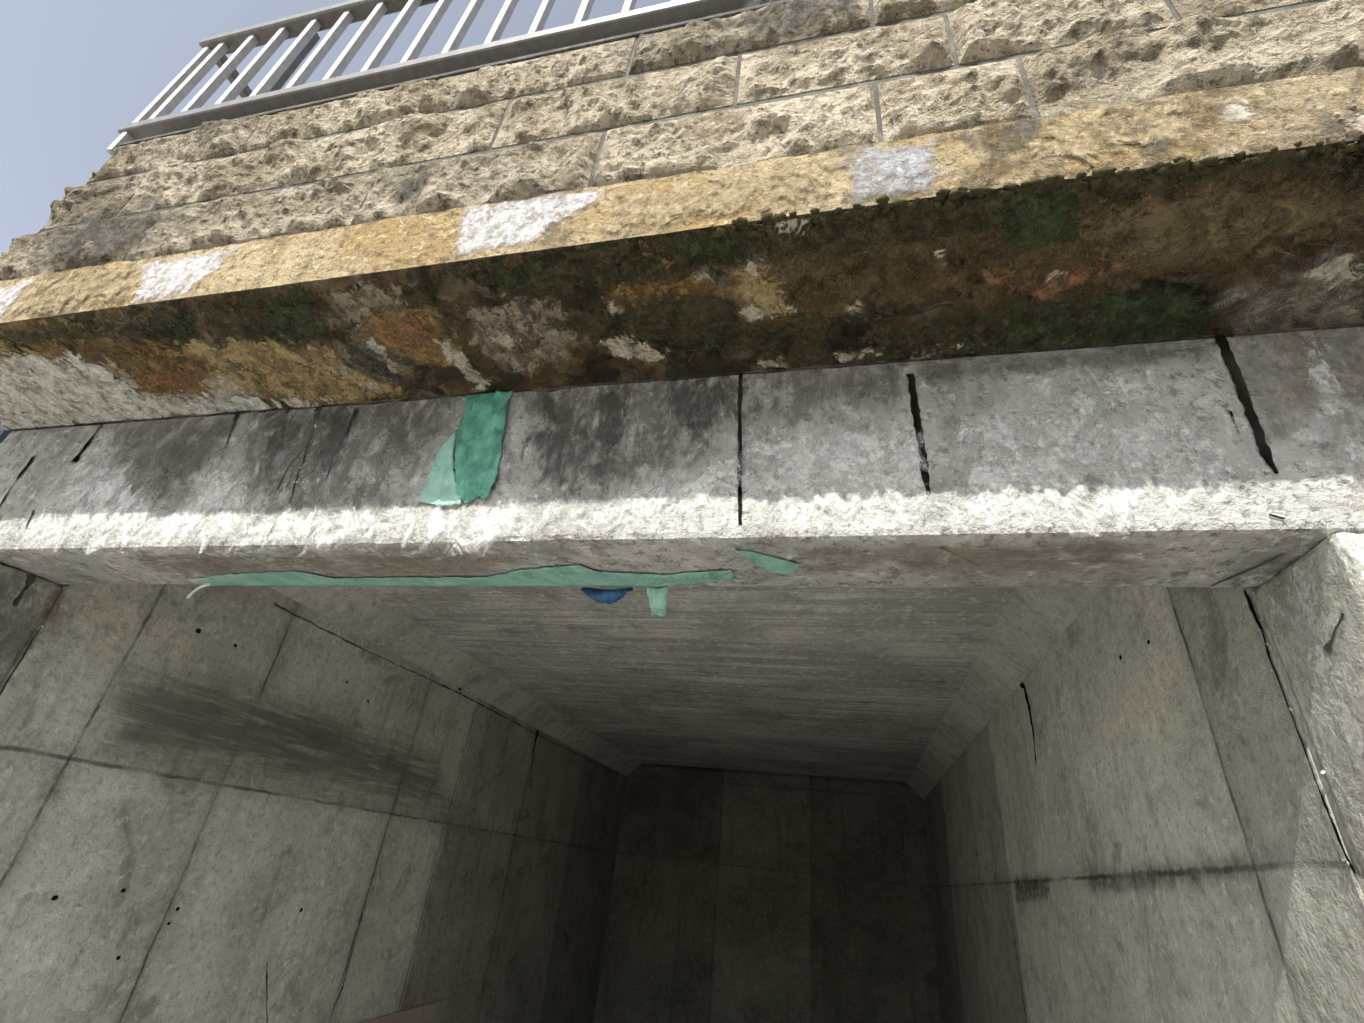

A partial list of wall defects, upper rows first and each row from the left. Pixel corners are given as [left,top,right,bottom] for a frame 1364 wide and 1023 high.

peeling [0,350,334,430]
peeling [279,279,408,394]
damp [36,362,921,547]
crack [736,372,744,525]
crack [906,373,931,495]
crack [1214,334,1279,474]
crack [0,575,68,695]
damp [133,686,441,796]
crack [1211,554,1362,889]